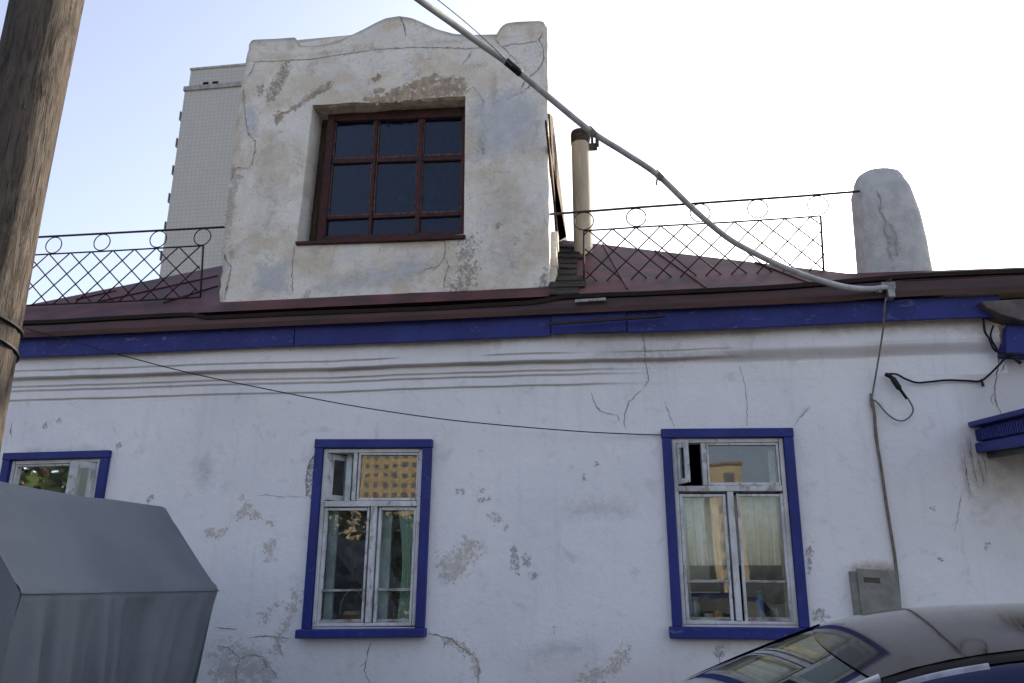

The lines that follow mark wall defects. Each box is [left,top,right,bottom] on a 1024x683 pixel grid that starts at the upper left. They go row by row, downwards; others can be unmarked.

spalling [274,81,334,125]
spalling [363,73,468,105]
crack [876,190,899,258]
crack [220,251,232,299]
crack [591,333,649,429]
peeling [510,546,541,581]
crack [218,627,290,683]